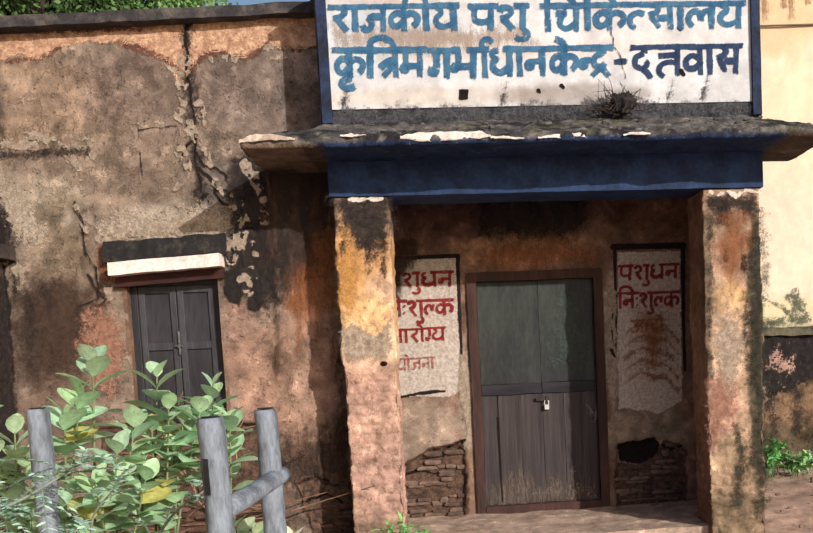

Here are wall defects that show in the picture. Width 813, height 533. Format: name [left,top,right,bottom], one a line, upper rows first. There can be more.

crack [138,24,232,215]
spalling [239,133,295,143]
crack [74,201,114,310]
leakage [95,151,418,380]
leakage [0,197,106,459]
rust [624,307,680,392]
flaking render [766,344,795,374]
leakage [280,349,349,497]
spalling [405,352,471,518]
spalling [614,437,688,507]
leakage [730,422,749,511]